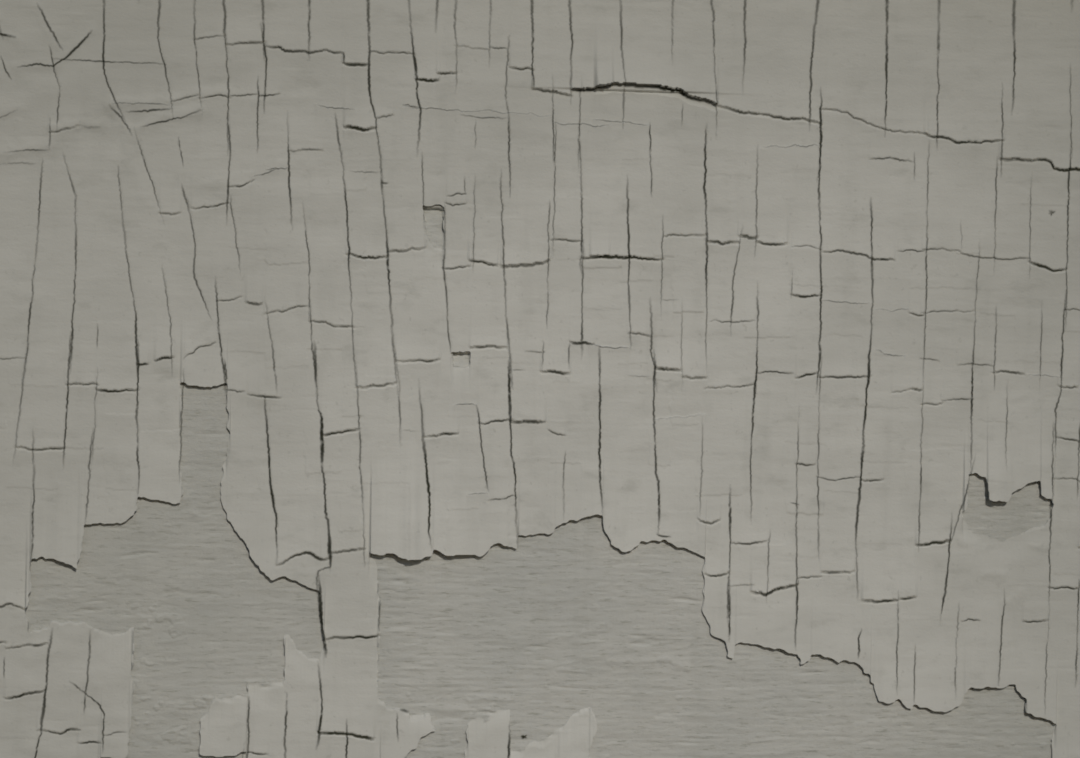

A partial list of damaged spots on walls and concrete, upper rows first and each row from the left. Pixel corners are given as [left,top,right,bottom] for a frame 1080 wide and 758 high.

crack [192,0,377,242]
crack [516,8,697,144]
crack [38,253,267,450]
peeling [25,313,325,758]
crack [267,410,380,650]
crack [318,682,371,758]
crack [478,369,561,504]
crack [559,201,675,537]
peeling [369,449,1058,758]
crack [745,216,928,534]
peeling [962,397,1055,542]
crack [995,158,1080,447]